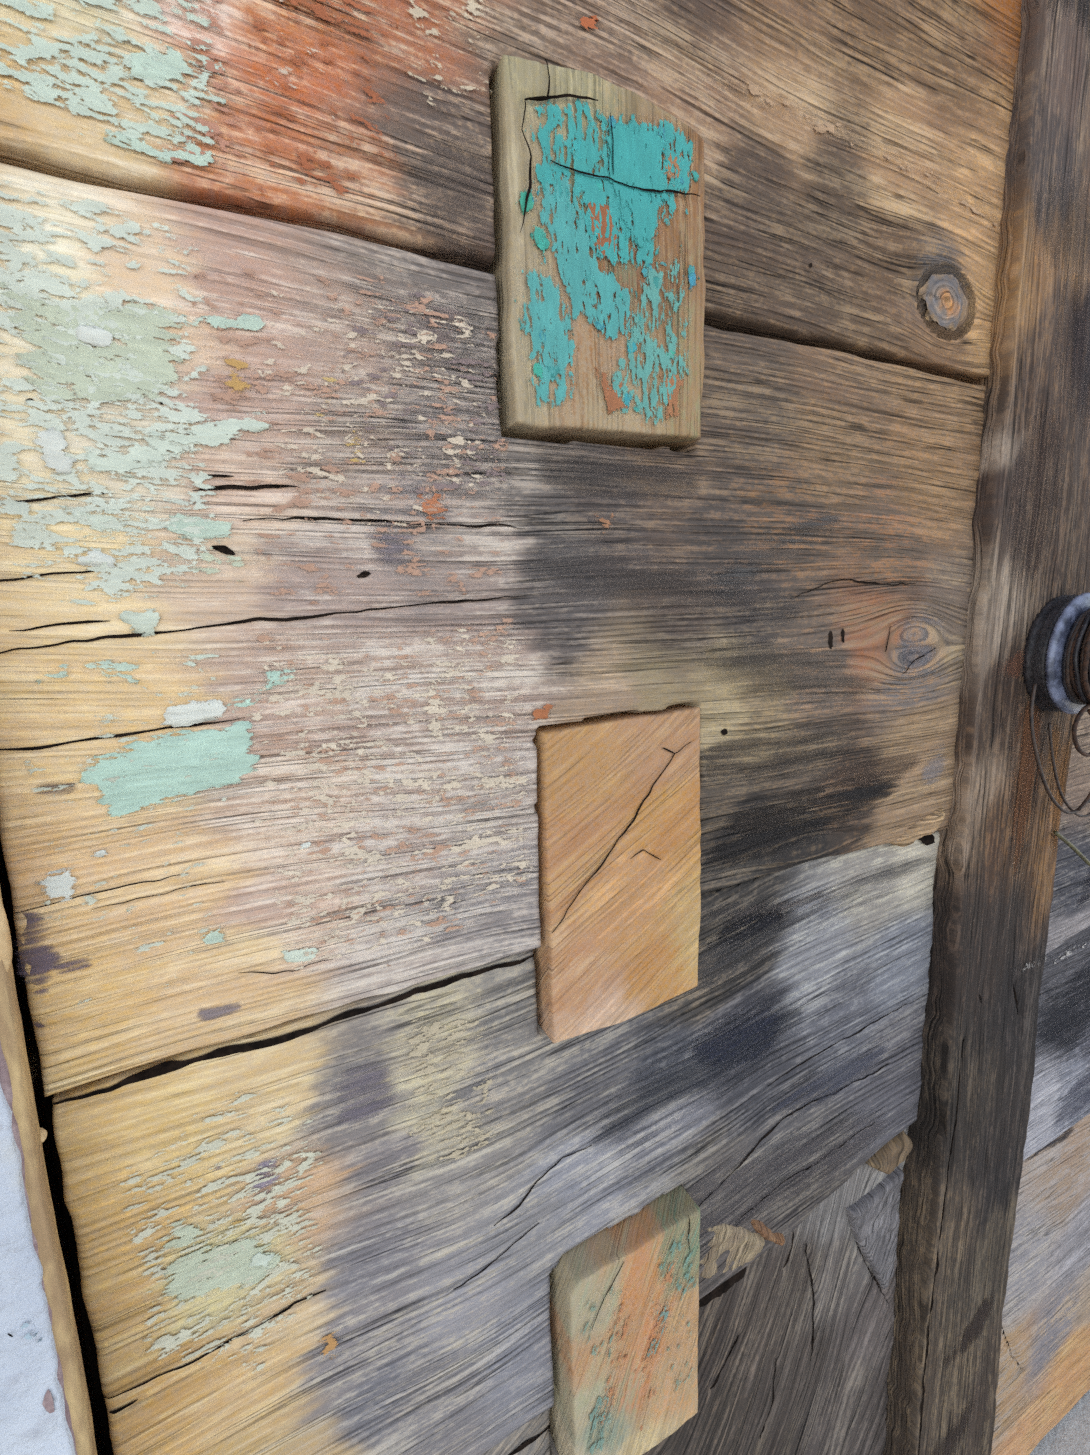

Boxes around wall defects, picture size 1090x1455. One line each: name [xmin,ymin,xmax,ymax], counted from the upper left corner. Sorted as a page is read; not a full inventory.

peeling [514,99,700,424]
peeling [0,282,265,405]
peeling [33,411,272,478]
crack [2,492,104,502]
crack [192,474,517,528]
crack [0,568,122,582]
peeling [35,609,160,684]
crack [0,596,519,654]
peeling [80,668,295,821]
crack [13,873,225,914]
crack [52,742,691,1105]
peeling [160,1219,283,1301]